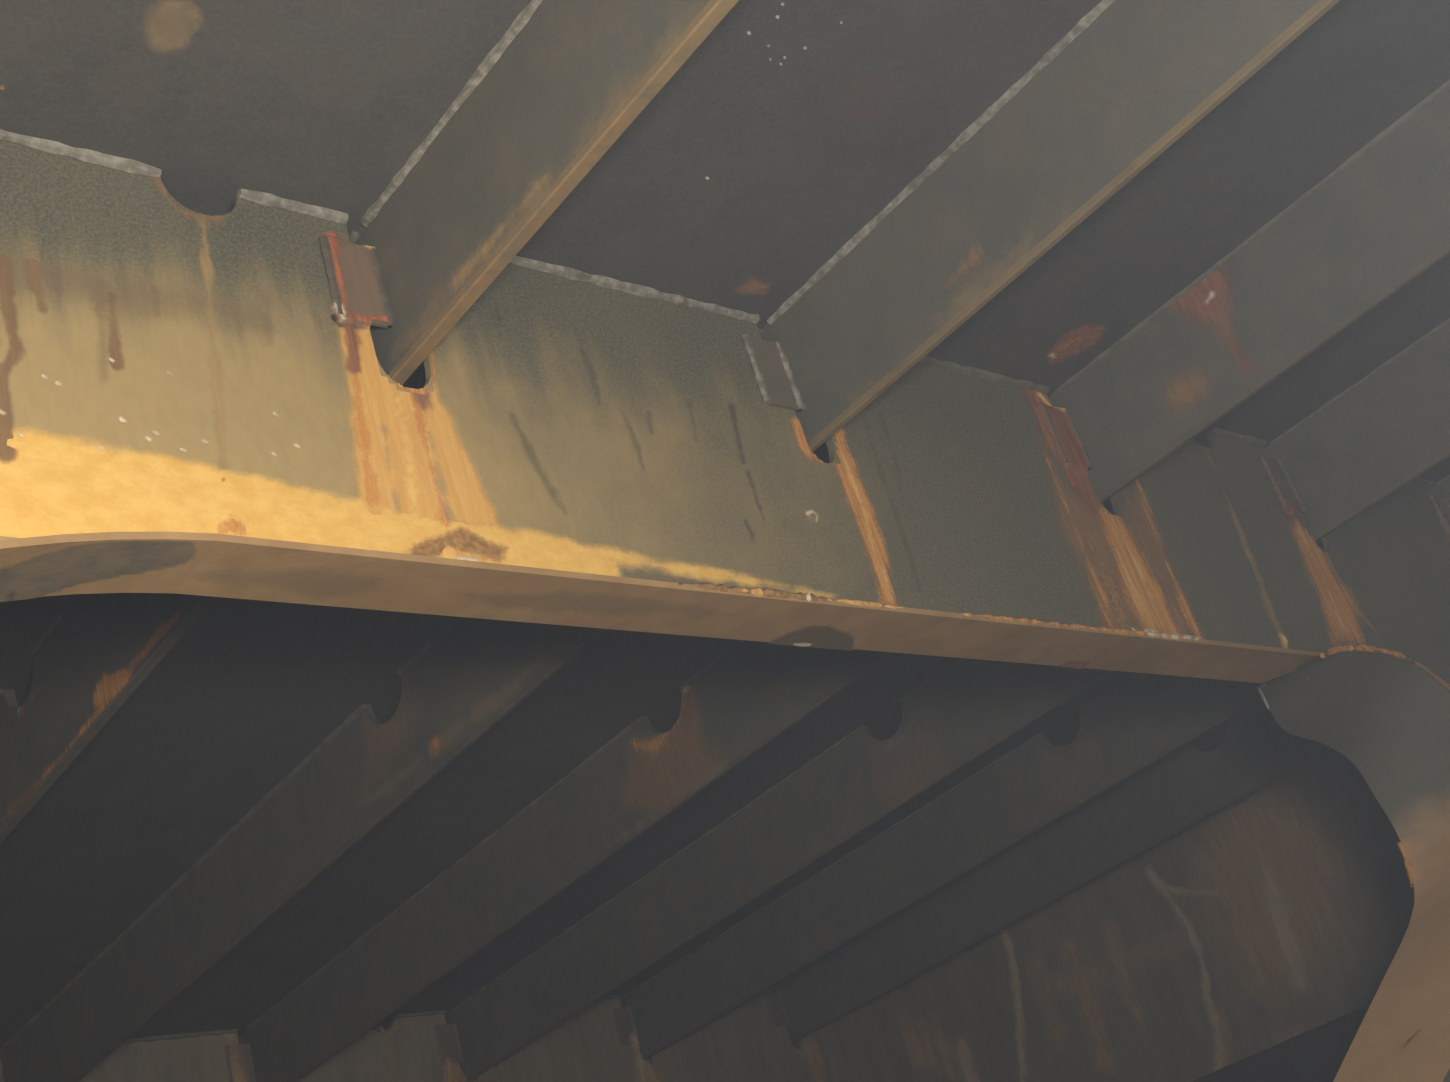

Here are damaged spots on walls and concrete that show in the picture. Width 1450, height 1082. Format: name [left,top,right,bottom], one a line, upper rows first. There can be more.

rust [325,232,497,526]
rust [1046,324,1104,364]
rust [1170,270,1251,371]
rust [678,418,904,609]
rust [962,388,1206,641]
rust [1267,461,1450,693]
rust [1397,842,1414,887]